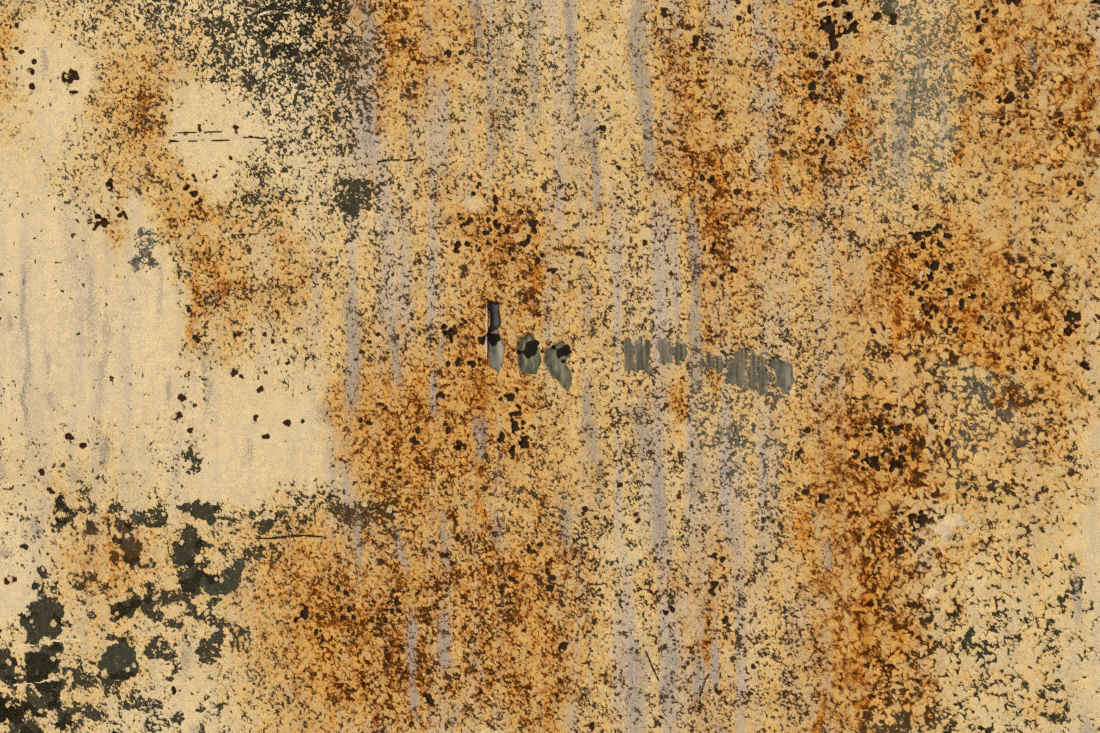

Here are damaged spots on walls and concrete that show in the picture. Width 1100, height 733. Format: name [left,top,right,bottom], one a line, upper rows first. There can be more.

spalling [62,68,80,97]
peeling [117,0,384,152]
leakage [358,0,376,58]
leakage [468,0,547,172]
leakage [627,0,656,189]
leakage [338,282,362,428]
leakage [617,208,775,406]
spalling [383,588,402,624]
leakage [405,608,421,730]
leakage [435,609,454,674]
spalling [520,542,544,554]
leakage [625,642,678,733]